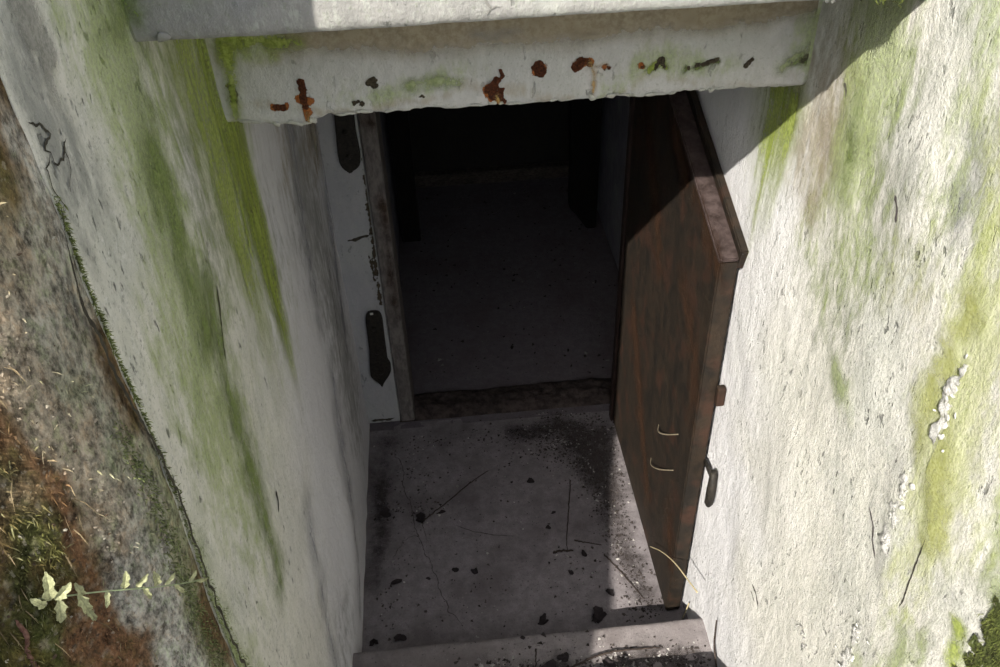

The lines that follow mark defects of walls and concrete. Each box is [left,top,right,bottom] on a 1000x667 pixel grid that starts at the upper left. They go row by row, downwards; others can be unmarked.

corrosion [270,78,314,123]
corrosion [482,69,507,104]
corrosion [531,60,547,78]
corrosion [571,56,611,73]
damp [771,92,799,175]
damp [201,39,287,344]
crack [29,122,253,667]
crack [899,540,925,606]